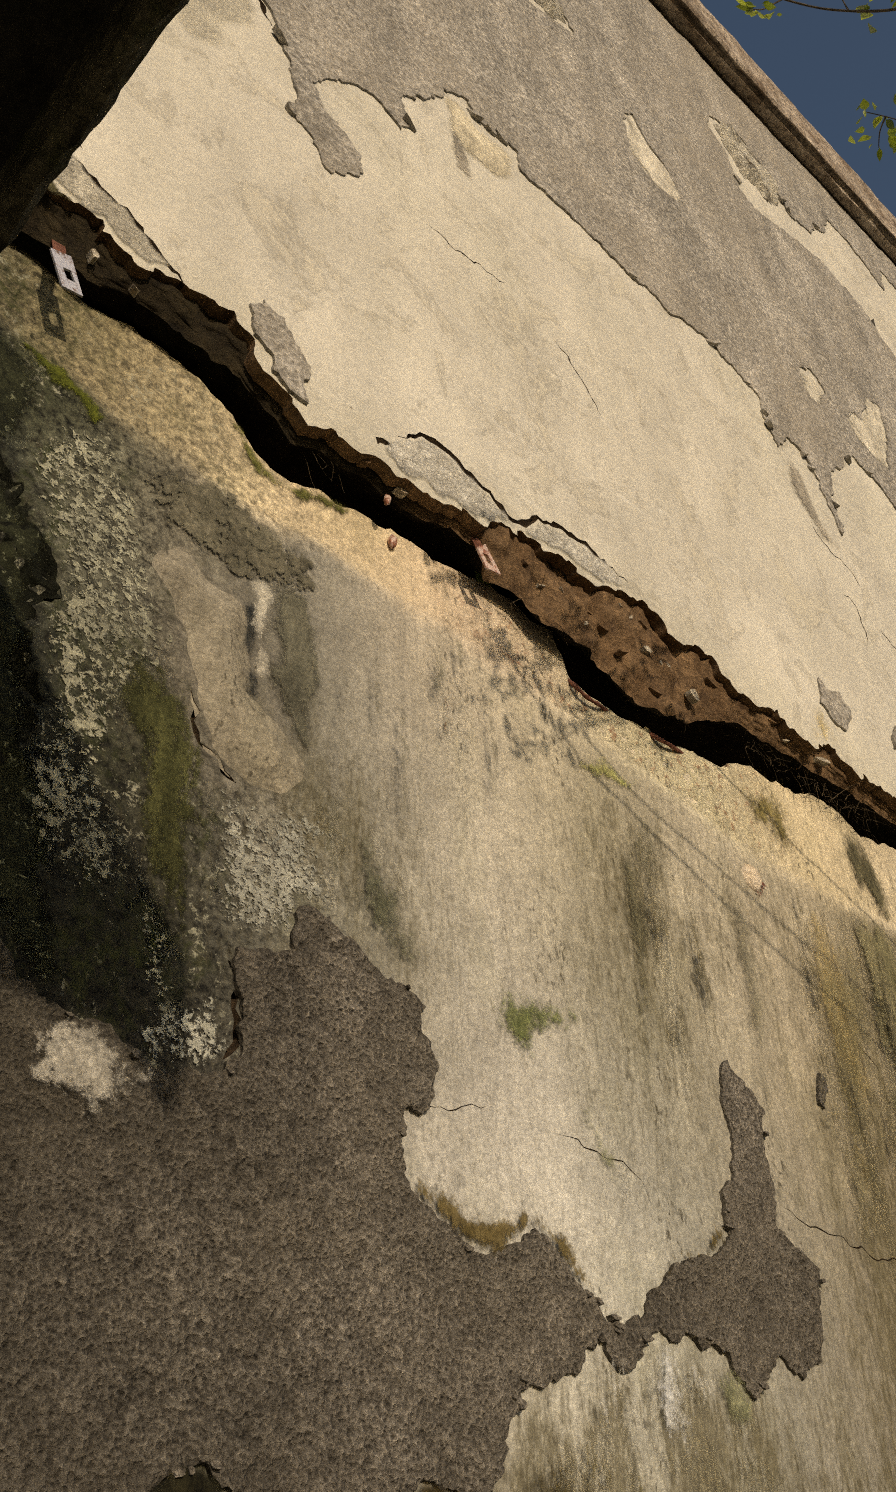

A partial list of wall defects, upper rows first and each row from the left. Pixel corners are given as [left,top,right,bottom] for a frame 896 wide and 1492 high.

crack [78,146,185,289]
crack [431,227,504,283]
flaking render [182,0,896,539]
crack [556,343,601,415]
spalling [21,154,896,825]
crack [376,432,627,581]
spalling [0,454,62,766]
crack [809,518,896,649]
crack [190,690,236,783]
flaking render [0,905,826,1492]
crack [785,1208,896,1262]